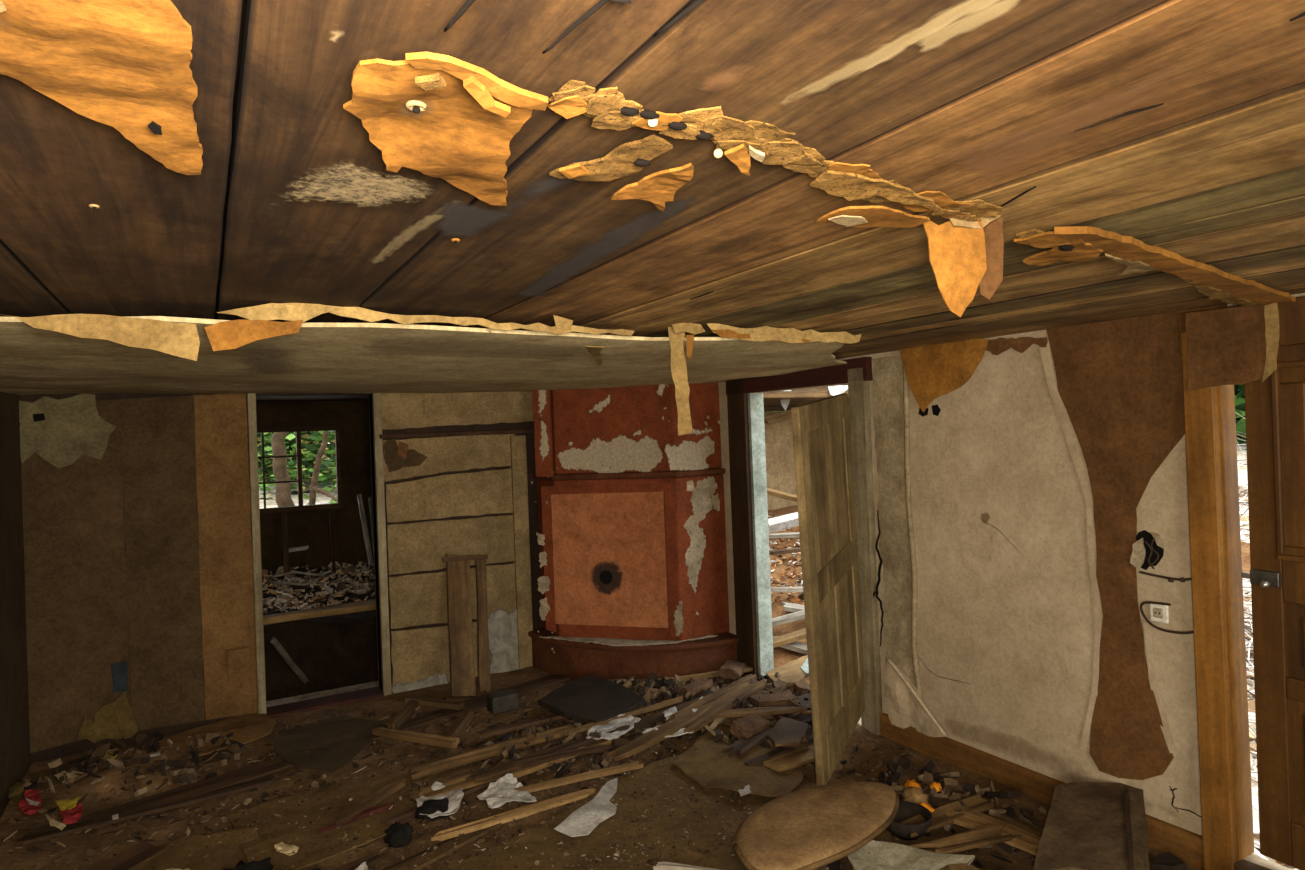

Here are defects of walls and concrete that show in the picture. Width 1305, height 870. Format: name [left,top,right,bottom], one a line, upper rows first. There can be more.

spalling [918,404,941,416]
peeling [536,533,555,653]
peeling [538,390,721,636]
crack [873,510,884,647]
hole [1130,530,1164,570]